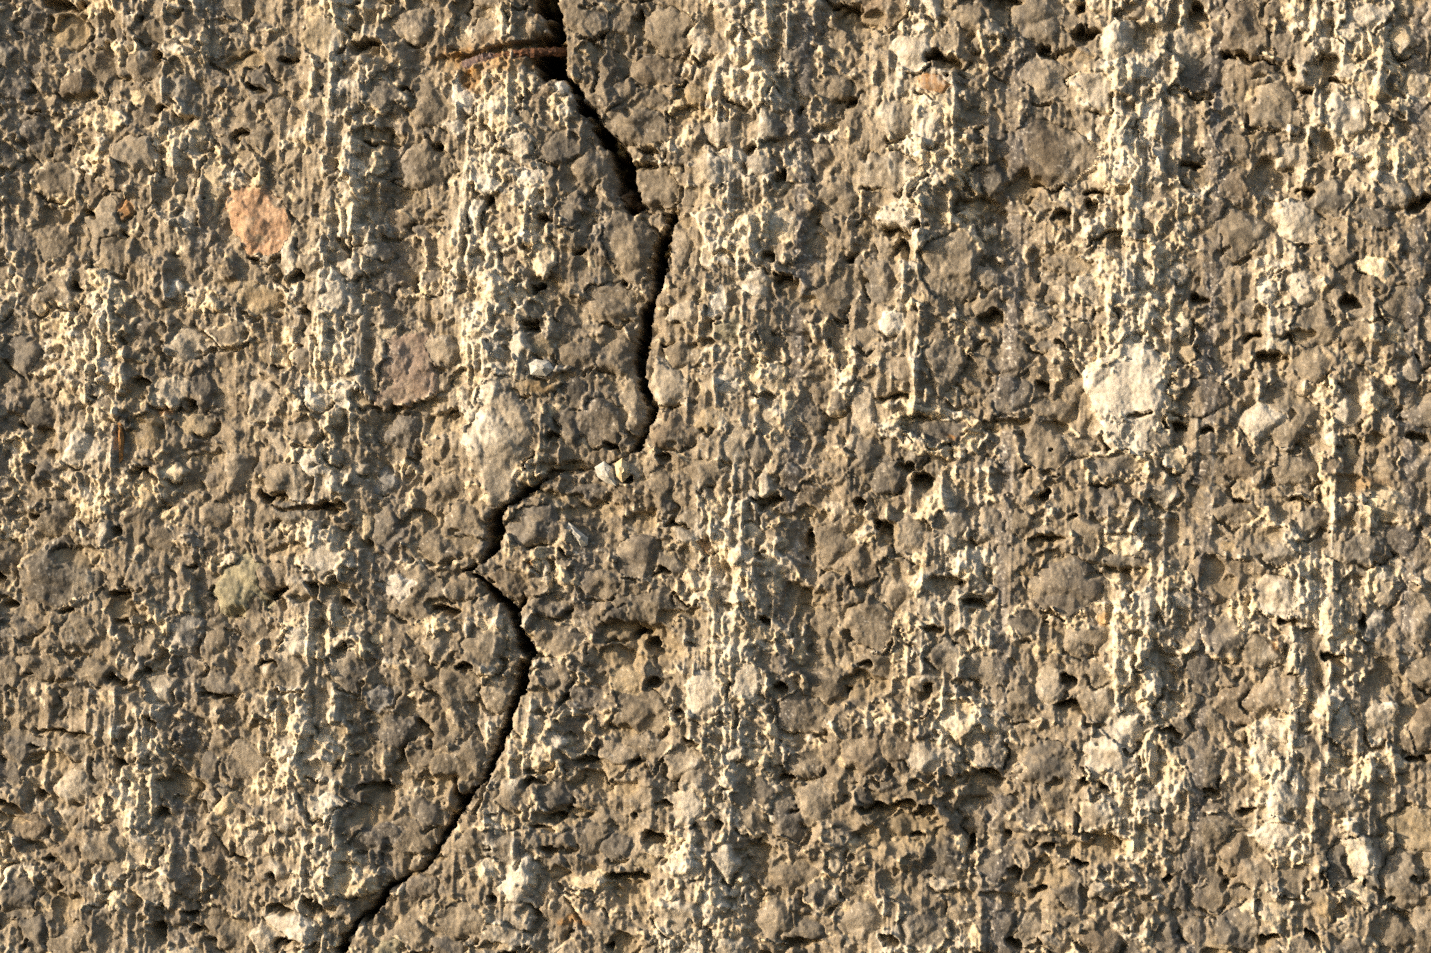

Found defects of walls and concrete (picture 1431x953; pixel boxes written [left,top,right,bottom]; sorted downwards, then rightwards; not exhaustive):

crack [273,504,342,513]
crack [336,0,681,953]